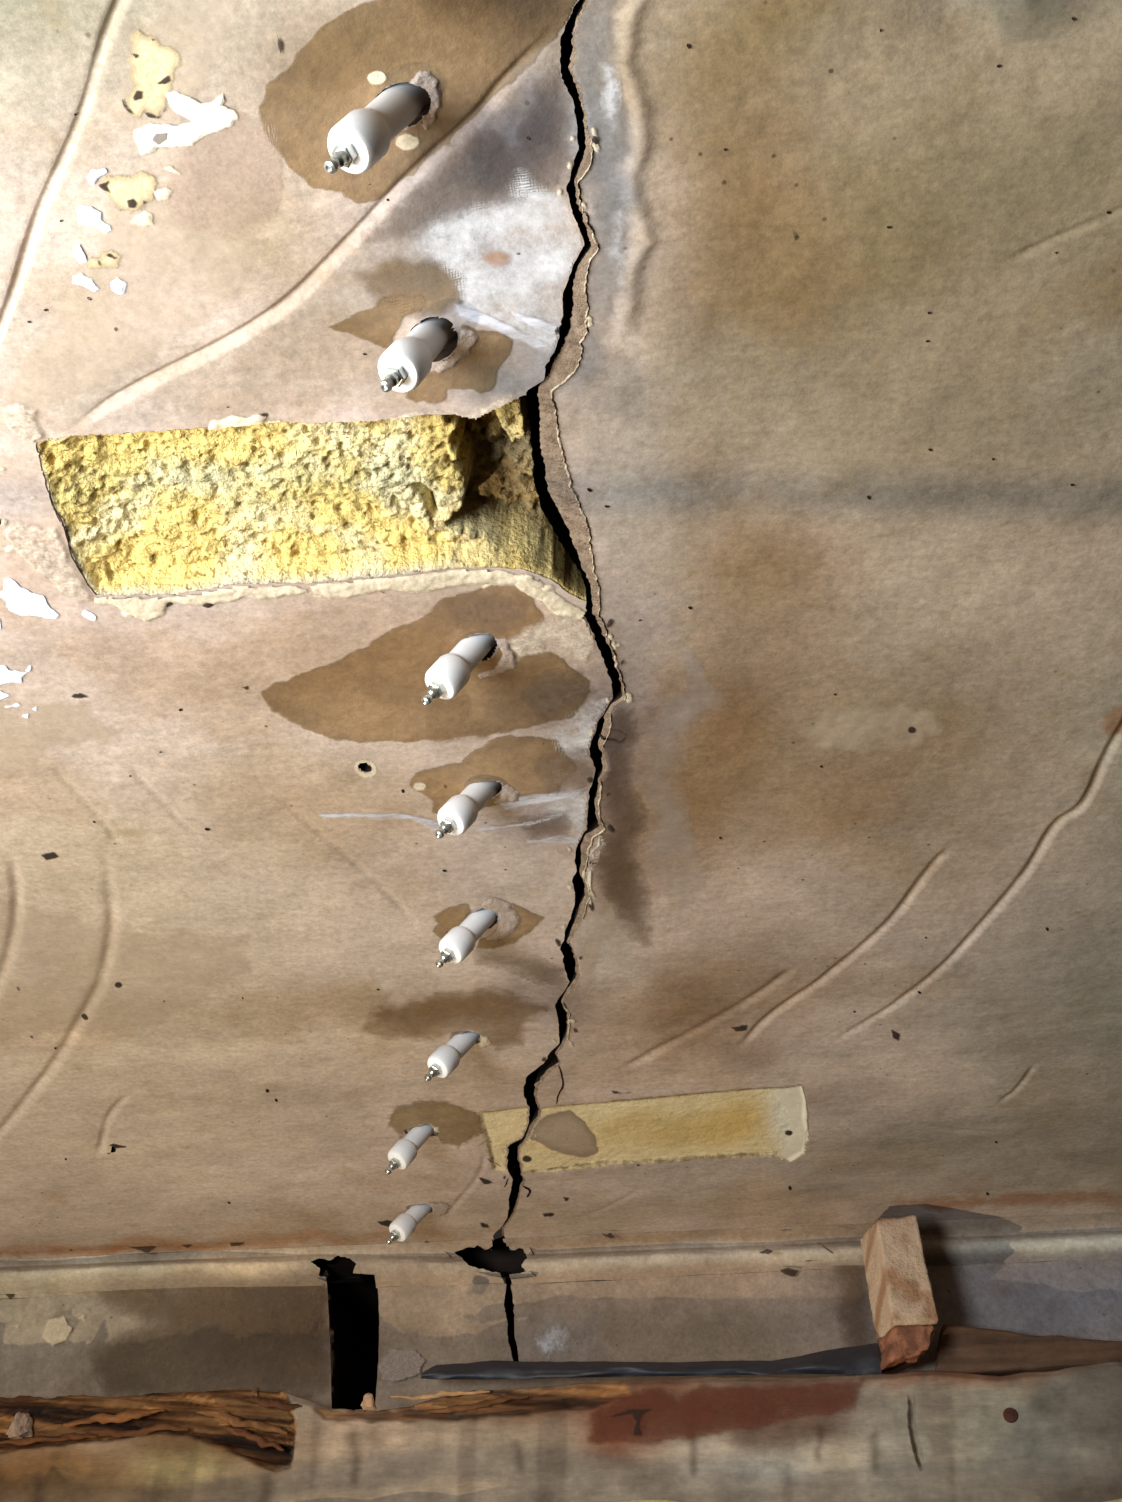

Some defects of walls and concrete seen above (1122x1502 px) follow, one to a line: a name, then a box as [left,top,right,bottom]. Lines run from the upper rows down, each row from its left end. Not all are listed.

spalling [60,30,238,300]
leakage [259,0,606,403]
crack [48,478,82,574]
spalling [0,392,587,622]
peeling [0,666,36,718]
spalling [478,638,517,679]
crack [487,0,632,1235]
leakage [261,585,644,933]
leakage [433,904,470,939]
leakage [365,991,546,1045]
spalling [311,1256,364,1283]
crack [504,1272,519,1361]